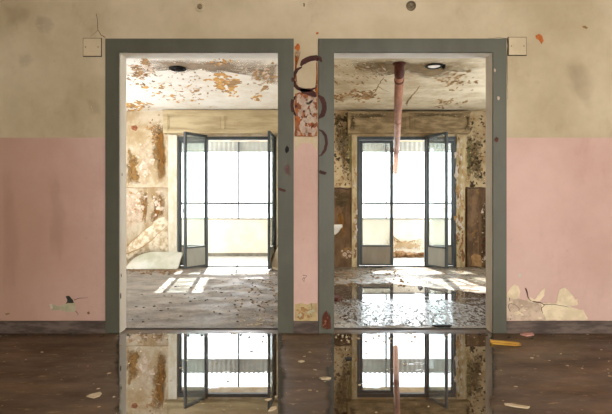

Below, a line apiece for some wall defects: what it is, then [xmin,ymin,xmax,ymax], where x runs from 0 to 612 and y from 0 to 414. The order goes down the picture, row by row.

peeling [126,58,278,111]
peeling [334,63,387,103]
peeling [435,69,479,109]
peeling [294,92,318,151]
damp [415,113,486,188]
peeling [126,114,165,228]
peeling [49,296,79,314]
spalling [295,303,317,321]
rust [322,310,331,329]
crack [508,288,566,320]
peeling [507,273,588,321]